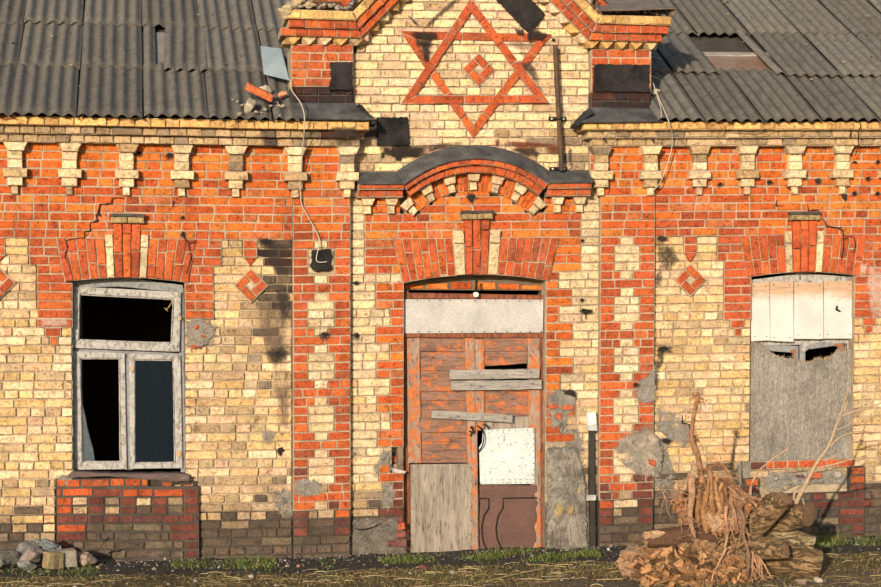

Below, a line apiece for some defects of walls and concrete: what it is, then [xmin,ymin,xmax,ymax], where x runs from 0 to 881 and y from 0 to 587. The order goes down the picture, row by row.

crack [64,197,123,267]
damp [262,289,290,350]